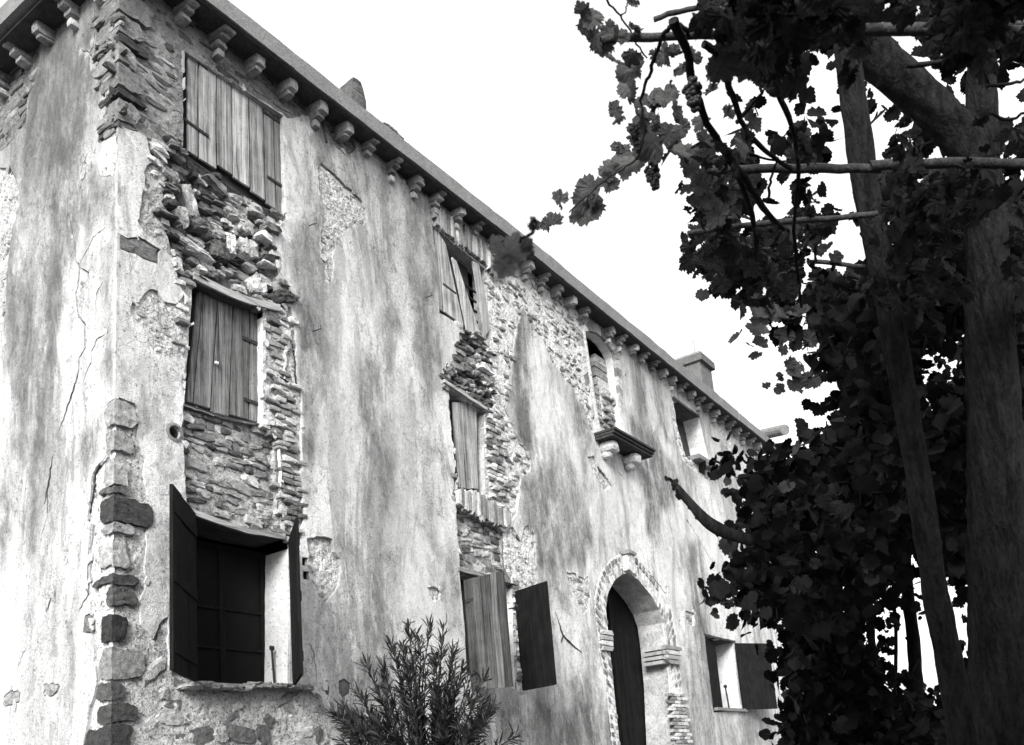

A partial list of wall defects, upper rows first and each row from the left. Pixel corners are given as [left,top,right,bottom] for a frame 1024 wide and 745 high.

water stain [23,26,97,180]
spalling [318,164,366,282]
water stain [32,389,46,472]
crack [44,455,53,512]
crack [61,362,80,426]
crack [89,465,101,521]
spalling [84,399,352,745]
spalling [131,272,338,603]
spalling [420,190,595,694]
water stain [514,319,634,559]
water stain [634,425,723,626]
water stain [484,687,611,745]